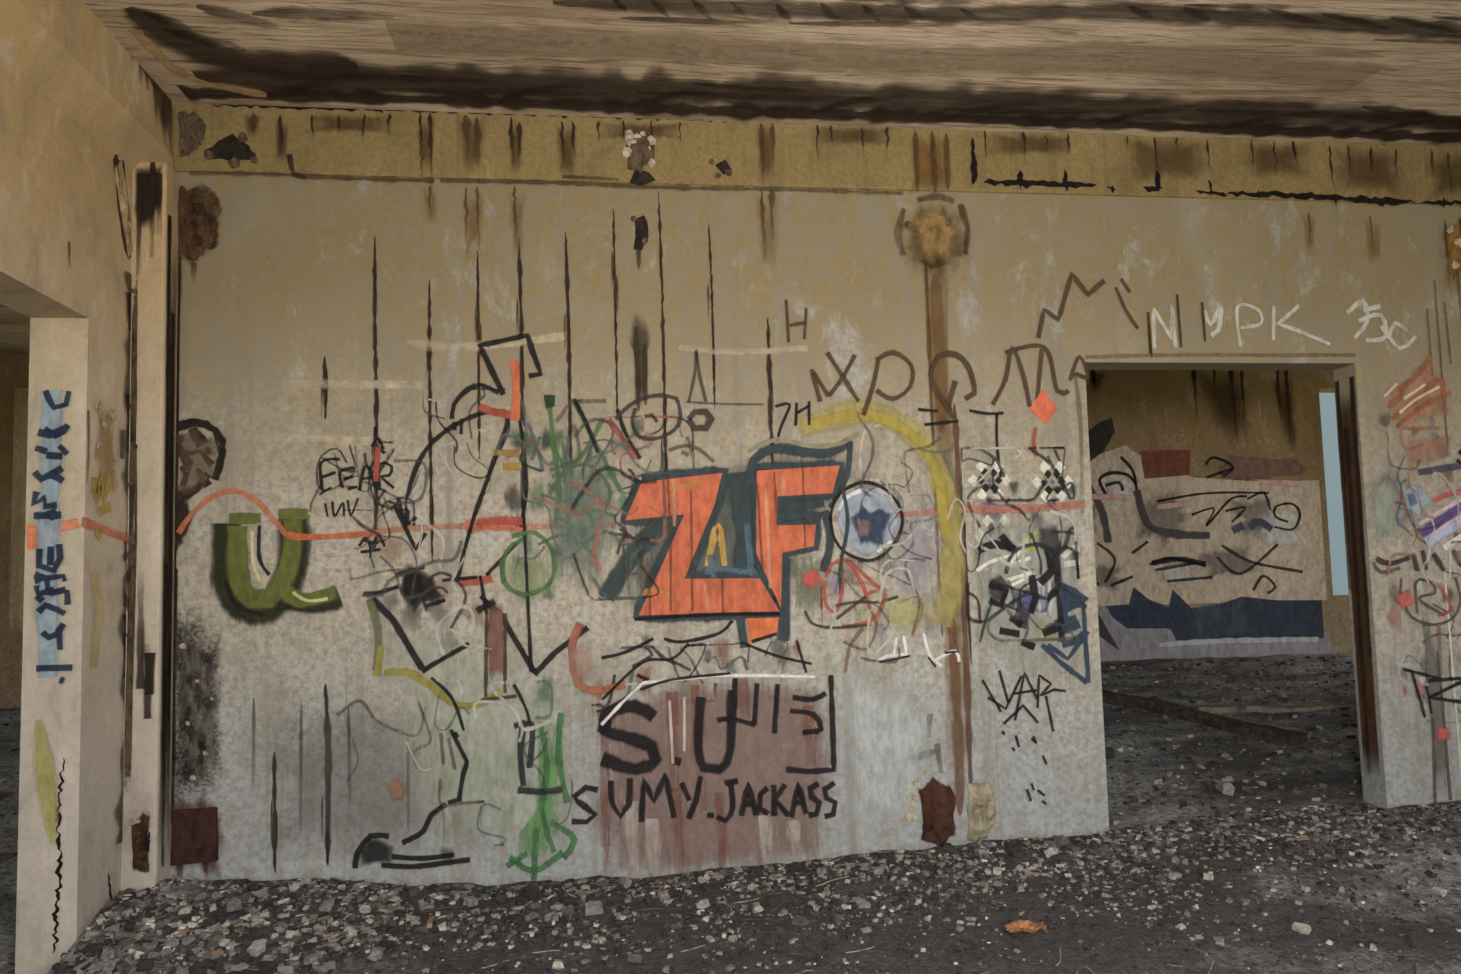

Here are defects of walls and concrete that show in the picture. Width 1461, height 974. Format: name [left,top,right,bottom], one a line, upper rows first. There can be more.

leakage [196,5,295,18]
leakage [387,0,1373,86]
leakage [139,64,172,133]
spalling [622,129,656,186]
leakage [1005,132,1070,152]
leakage [1328,106,1418,183]
rust [178,184,222,275]
leakage [218,83,904,507]
leakage [1074,353,1355,441]
leakage [120,162,221,865]
rust [925,264,972,815]
leakage [115,743,124,845]